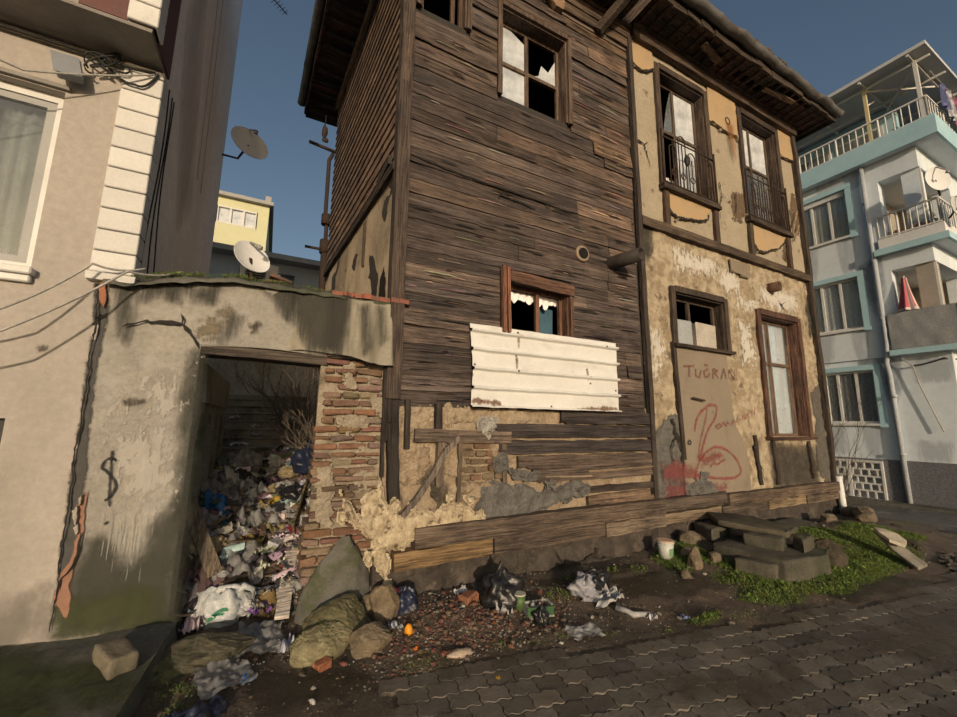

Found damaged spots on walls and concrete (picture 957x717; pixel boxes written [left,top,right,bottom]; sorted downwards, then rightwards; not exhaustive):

peeling [670,193,711,223]
peeling [728,191,800,262]
leakage [180,353,199,440]
leakage [274,285,349,353]
leakage [361,305,383,354]
peeling [650,326,668,383]
peeling [670,245,801,367]
crack [49,283,199,633]
peeling [100,361,189,581]
flaking render [656,414,686,498]
peeling [53,492,88,618]
leakage [54,457,190,637]